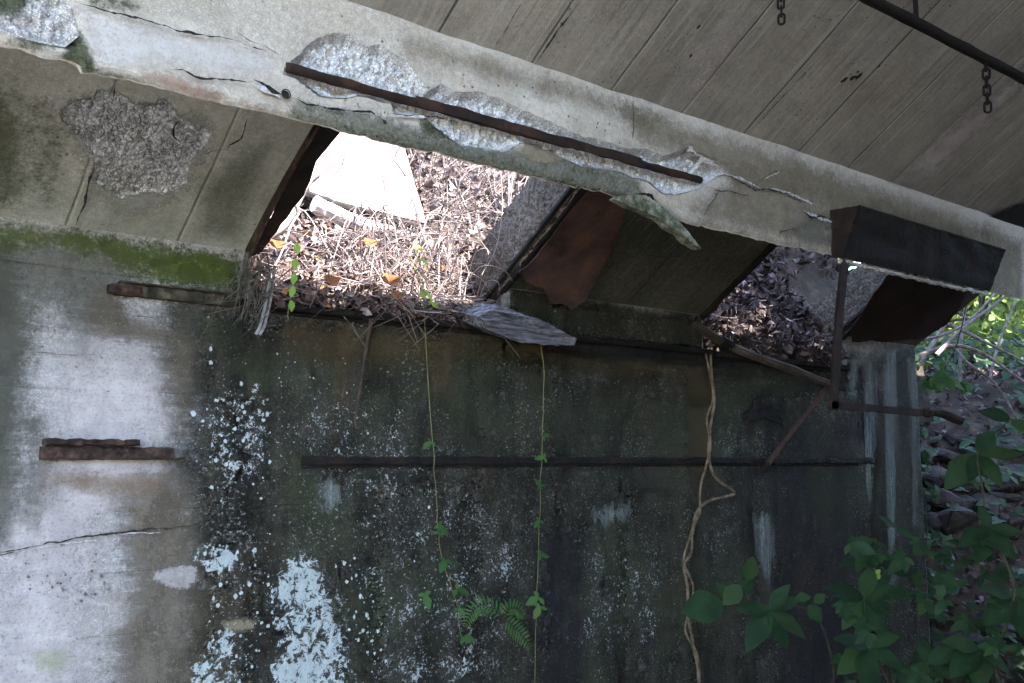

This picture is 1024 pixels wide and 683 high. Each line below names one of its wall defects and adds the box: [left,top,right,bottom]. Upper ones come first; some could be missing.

spalling [0,0,79,47]
crack [78,2,279,55]
crack [173,69,452,125]
flaking render [61,89,215,199]
spalling [285,33,725,250]
crack [77,163,95,222]
crack [706,170,832,241]
damp [0,224,919,683]
crack [0,522,200,556]